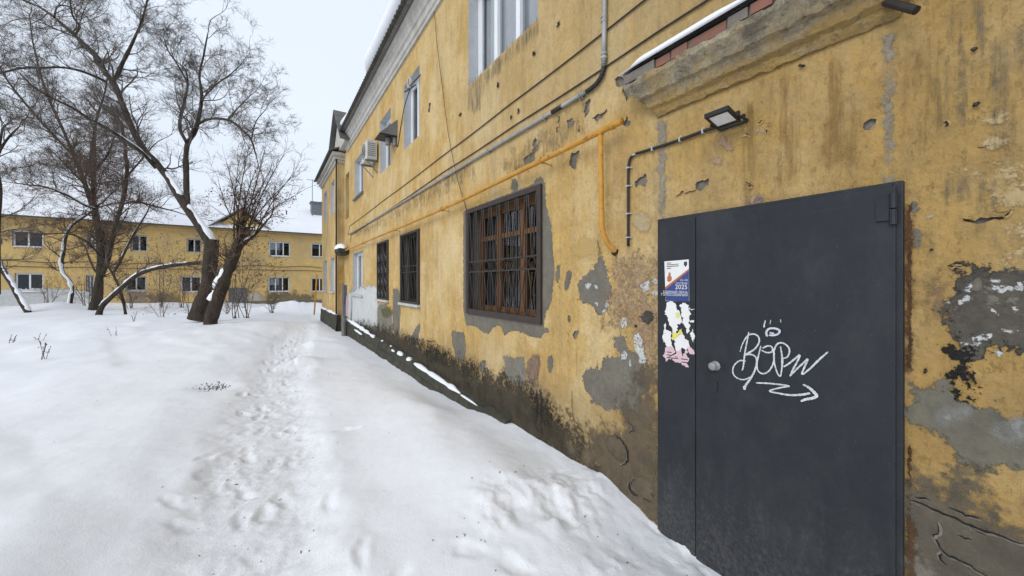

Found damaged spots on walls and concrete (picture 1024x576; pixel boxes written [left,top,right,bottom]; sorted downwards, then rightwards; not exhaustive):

flaking render [523,137,541,165]
flaking render [569,151,580,171]
flaking render [556,99,608,133]
flaking render [694,177,710,192]
peeling [600,247,658,371]
rust [904,203,915,372]
peeling [524,355,549,404]
damp [355,320,658,525]
rust [904,445,917,576]
crack [910,497,1024,576]